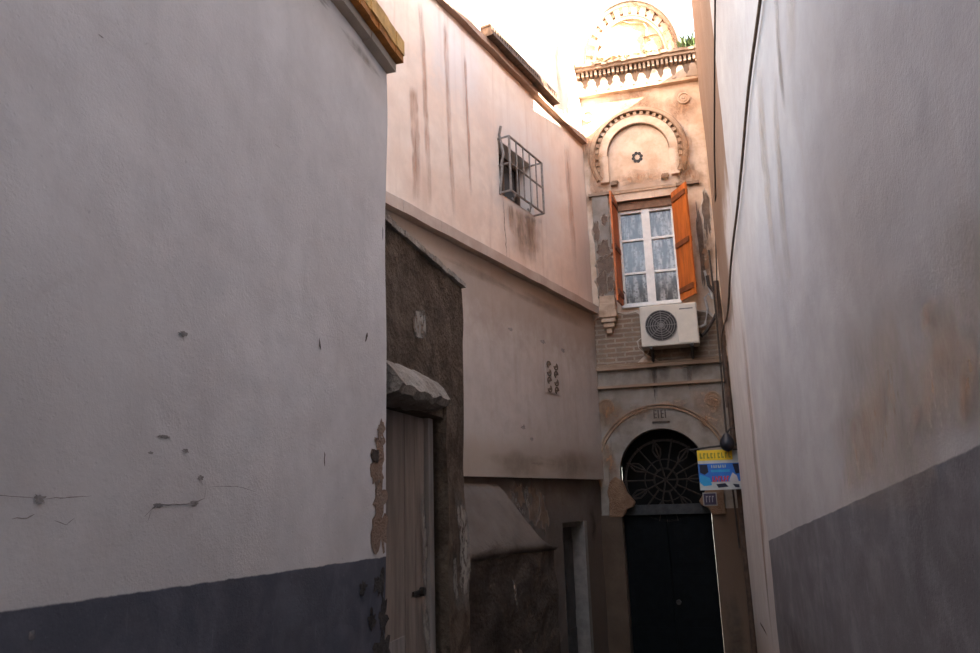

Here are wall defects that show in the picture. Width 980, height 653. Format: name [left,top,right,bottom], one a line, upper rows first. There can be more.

spalling [596,21,664,62]
spalling [591,213,615,296]
crack [0,494,89,525]
crack [144,486,255,517]
spalling [370,418,388,554]
peeling [359,567,391,653]